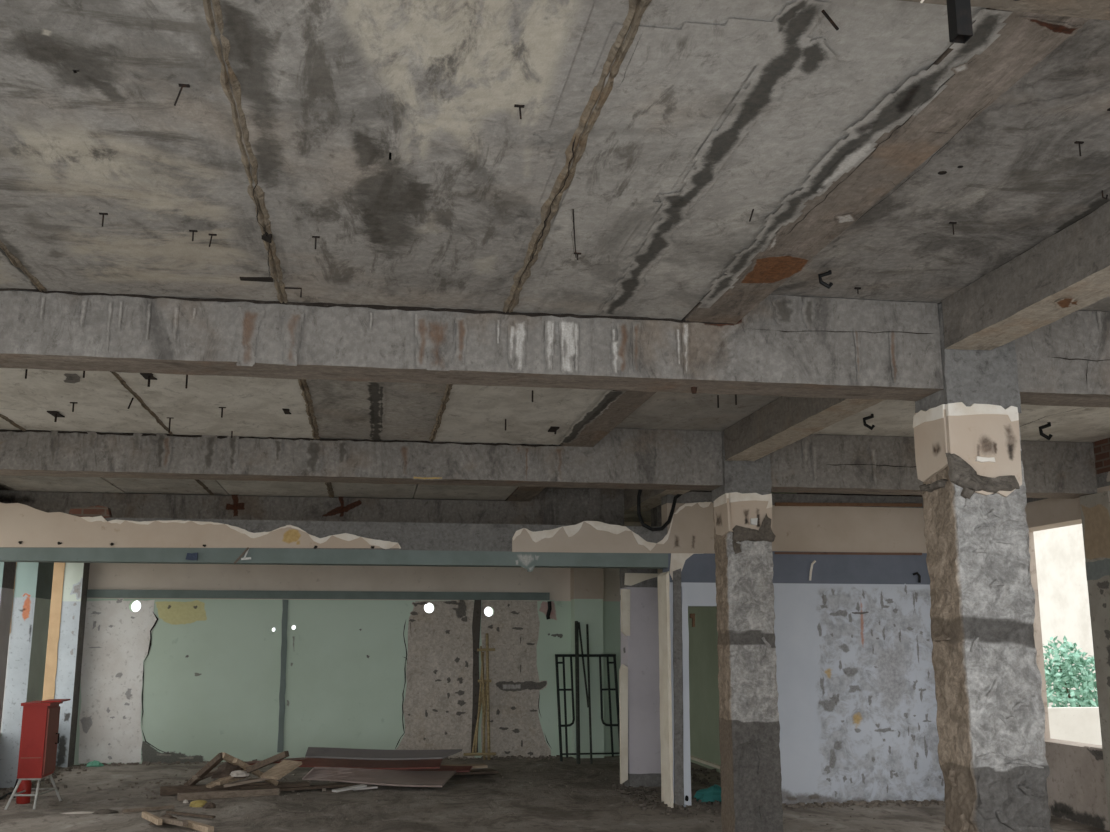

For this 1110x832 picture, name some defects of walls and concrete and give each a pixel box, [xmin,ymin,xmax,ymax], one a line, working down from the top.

leakage [0,174,93,328]
leakage [0,0,558,298]
leakage [497,319,527,372]
crack [519,137,576,283]
leakage [540,0,837,374]
rust [739,255,813,284]
leakage [697,9,1013,308]
peeling [0,502,401,549]
peeling [1080,503,1110,562]
peeling [70,578,208,764]
peeling [396,600,564,759]
peeling [813,584,957,798]